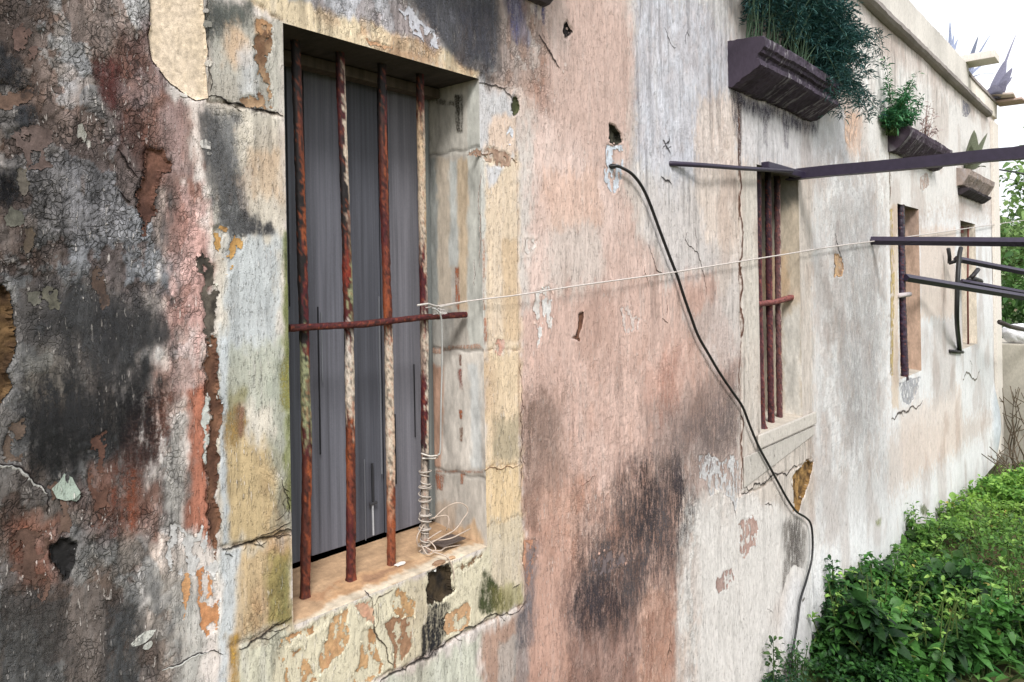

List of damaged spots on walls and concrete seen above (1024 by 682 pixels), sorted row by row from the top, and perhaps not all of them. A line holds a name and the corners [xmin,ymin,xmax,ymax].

crack [180,0,283,116]
leakage [200,113,273,237]
spalling [48,537,78,581]
leakage [20,297,162,471]
spalling [165,223,243,637]
peeling [277,553,483,682]
corrosion [436,470,478,490]
corrosion [433,307,487,385]
leakage [566,363,737,632]
crack [732,97,814,519]
spalling [791,460,813,512]
crack [891,400,923,420]